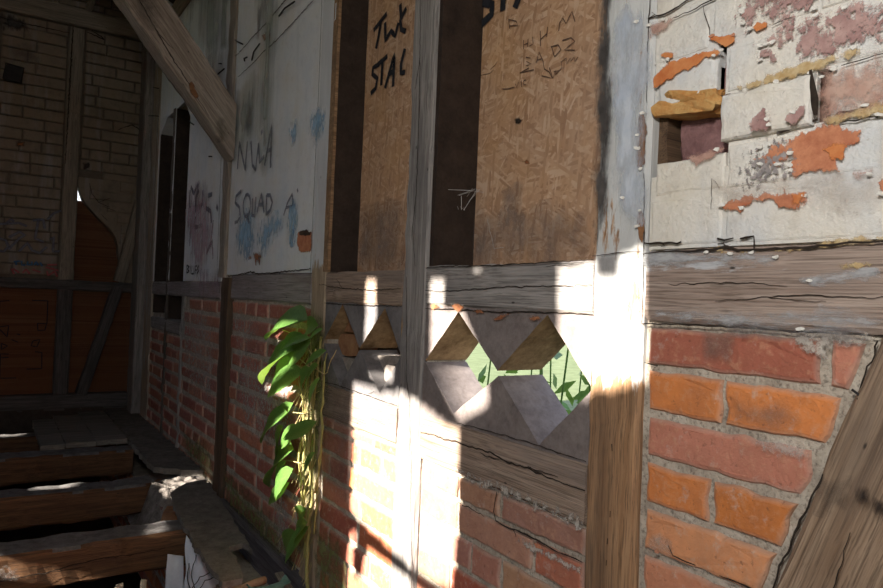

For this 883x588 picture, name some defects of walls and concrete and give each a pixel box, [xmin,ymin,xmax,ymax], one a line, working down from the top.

crack [646,0,712,101]
spalling [613,0,883,242]
crack [228,58,883,530]
peeling [643,245,801,265]
crack [457,474,582,562]
crack [772,473,824,588]
crack [833,533,850,588]